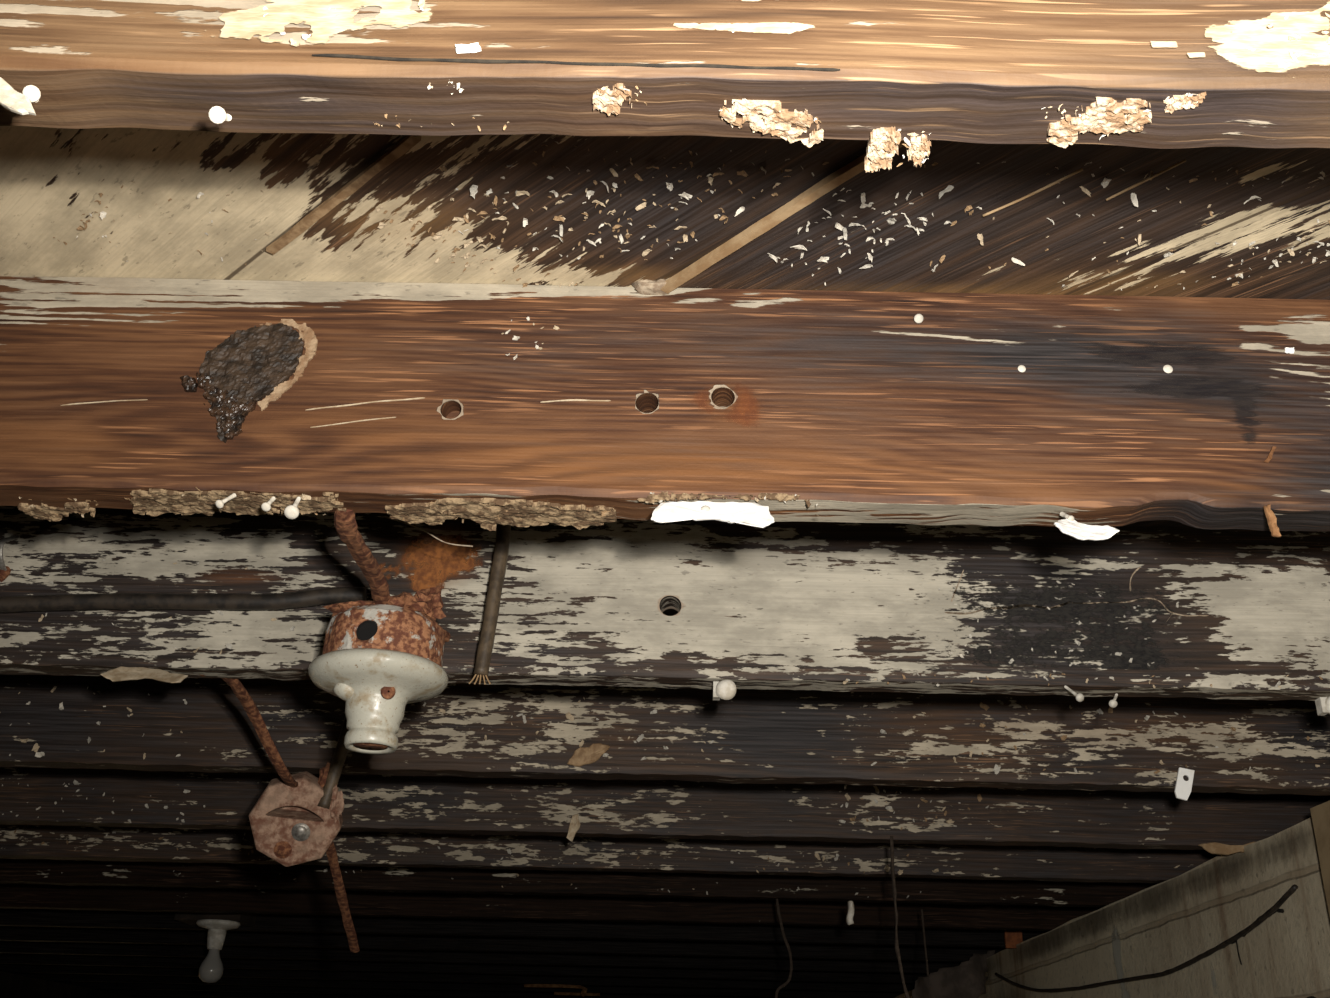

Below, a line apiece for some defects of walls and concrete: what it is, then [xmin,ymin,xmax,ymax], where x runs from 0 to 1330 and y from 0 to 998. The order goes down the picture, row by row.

peeling [205,0,433,47]
peeling [1151,2,1330,78]
peeling [0,77,36,116]
peeling [1042,92,1206,148]
peeling [857,127,938,173]
peeling [376,99,829,287]
peeling [767,188,995,286]
peeling [125,487,346,516]
peeling [385,498,617,531]
peeling [637,491,819,528]
peeling [1054,518,1120,540]
rust [323,534,482,621]